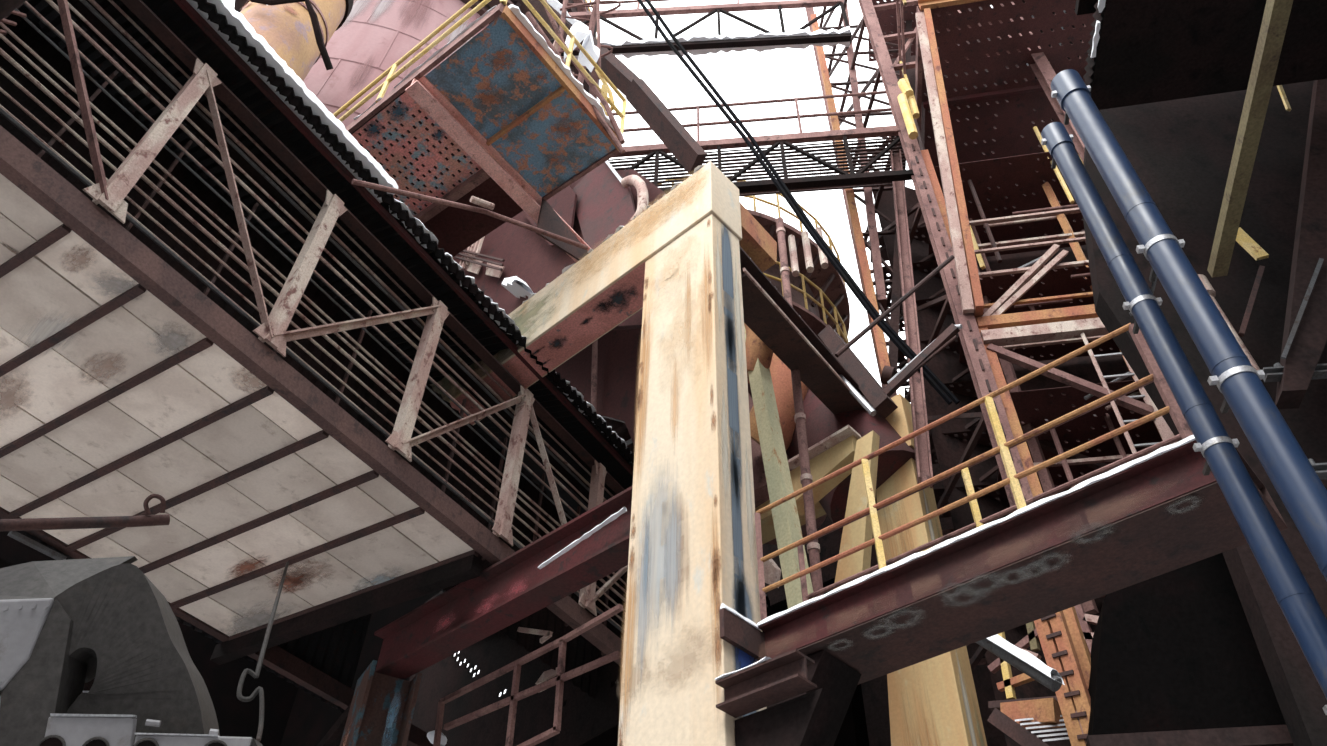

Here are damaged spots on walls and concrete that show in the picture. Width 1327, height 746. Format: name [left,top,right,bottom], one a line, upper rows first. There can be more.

leakage [638,482,680,661]